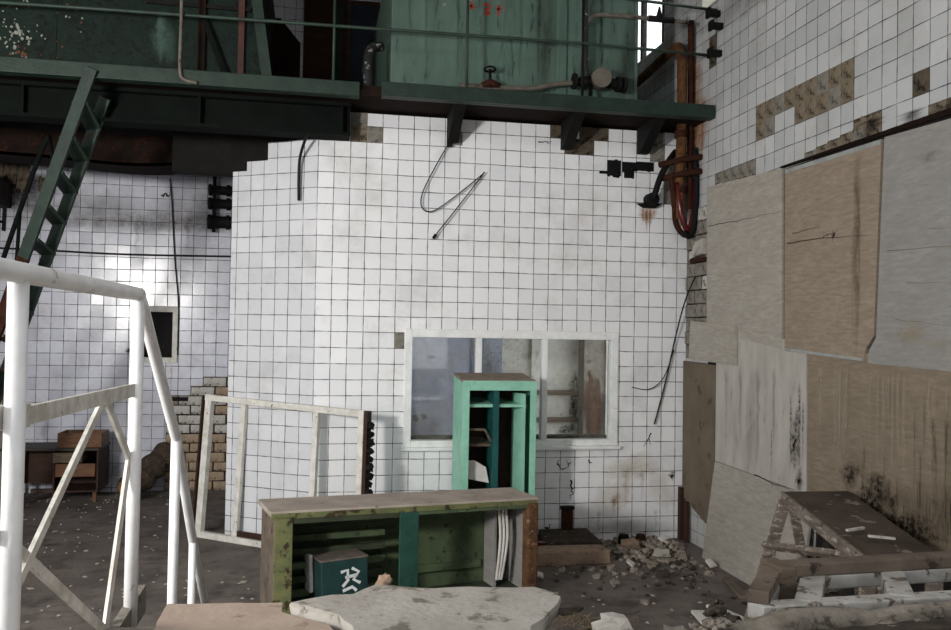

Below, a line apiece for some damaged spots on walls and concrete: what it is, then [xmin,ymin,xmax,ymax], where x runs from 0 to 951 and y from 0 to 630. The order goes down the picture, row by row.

peeling [756,57,855,141]
peeling [912,67,951,115]
peeling [350,112,383,143]
peeling [550,125,561,139]
peeling [564,127,609,156]
peeling [804,109,882,158]
peeling [715,158,756,185]
flaking render [599,132,707,359]
flaking render [165,377,228,490]
damp [860,479,938,541]